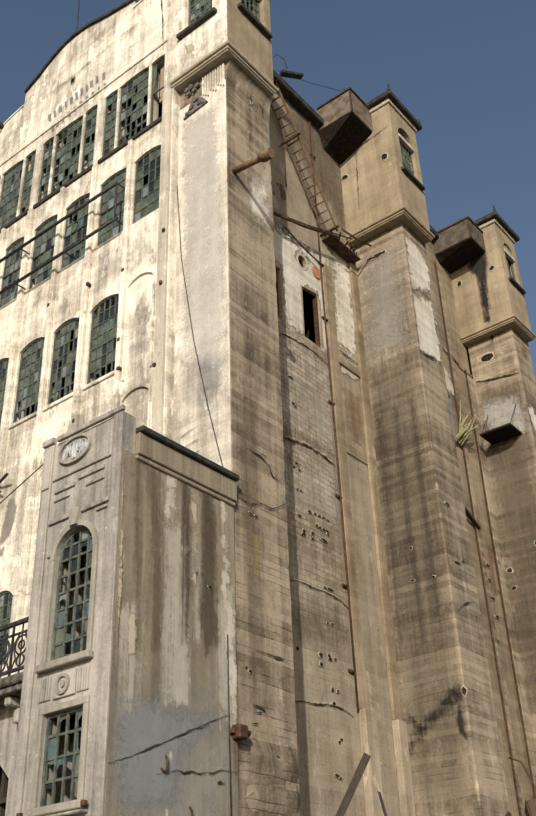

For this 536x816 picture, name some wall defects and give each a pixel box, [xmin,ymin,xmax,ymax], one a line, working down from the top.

peeling [247,178,359,448]
peeling [405,237,455,396]
crack [283,429,335,466]
crack [241,448,285,511]
peeling [284,455,339,543]
water stain [110,471,236,816]
crack [109,713,234,763]
crack [295,697,354,717]
water stain [411,688,466,744]
crack [156,770,264,799]